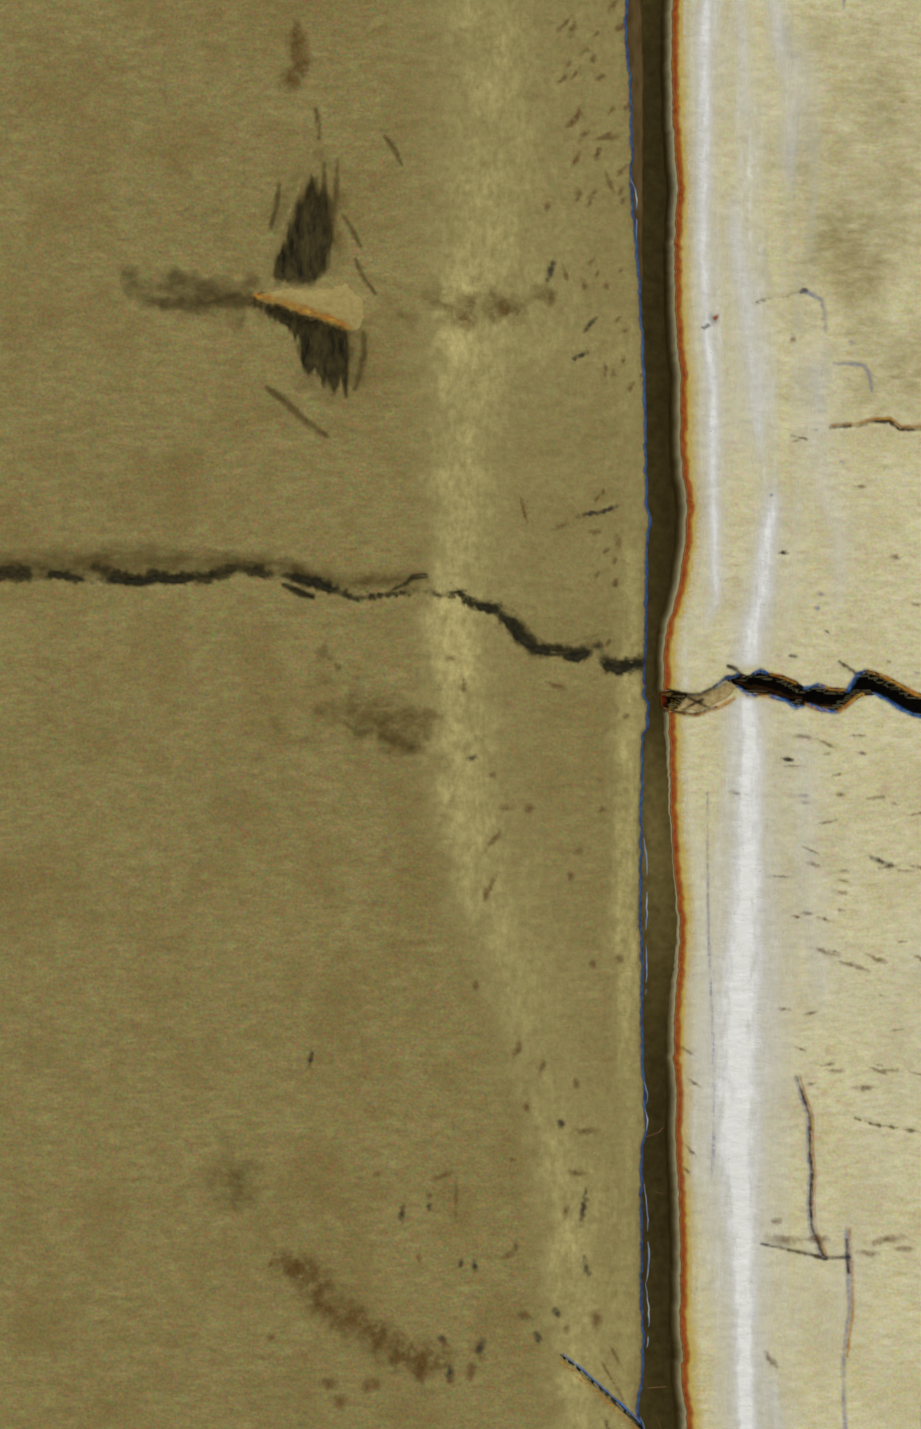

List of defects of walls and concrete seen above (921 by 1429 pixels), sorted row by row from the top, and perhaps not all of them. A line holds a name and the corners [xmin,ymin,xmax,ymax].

spalling [274,177,332,283]
spalling [254,303,348,396]
crack [832,388,918,431]
crack [0,554,644,675]
crack [665,661,921,718]